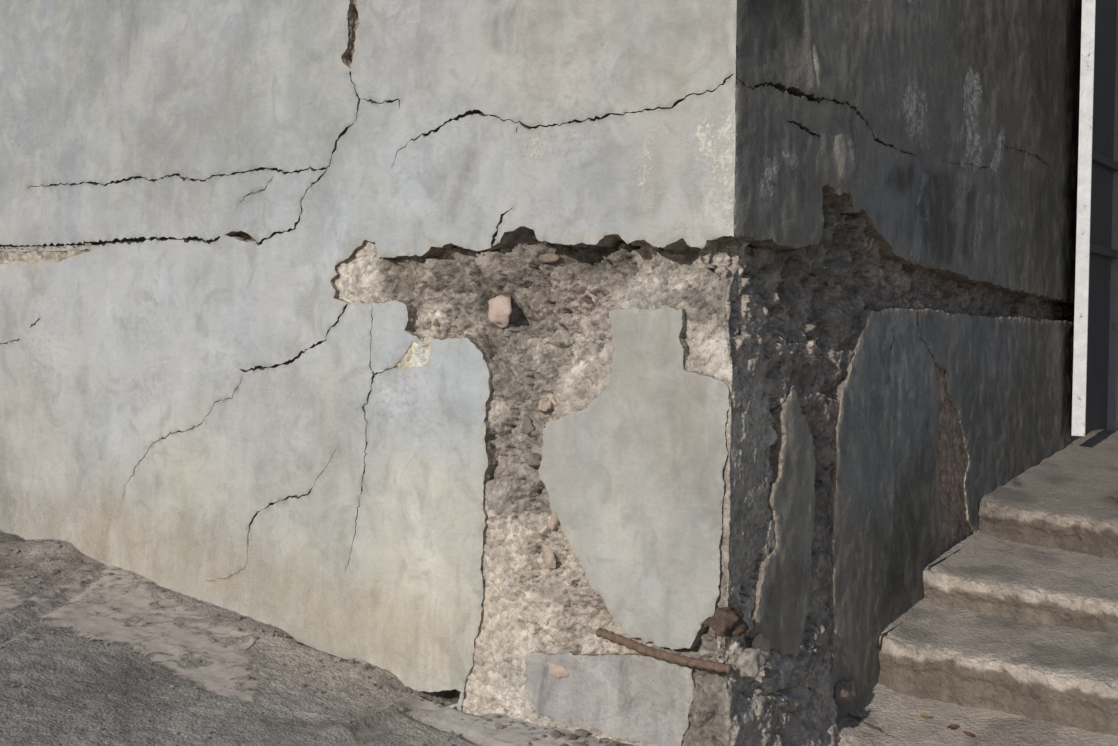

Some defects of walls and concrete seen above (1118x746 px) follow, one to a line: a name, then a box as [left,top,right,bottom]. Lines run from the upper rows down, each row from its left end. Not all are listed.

crack [27,71,400,245]
crack [391,73,917,168]
damp [761,152,798,197]
damp [902,79,930,149]
damp [959,67,1004,180]
crack [0,236,221,265]
crack [491,207,513,246]
crack [122,303,397,582]
flaking render [330,183,1075,746]